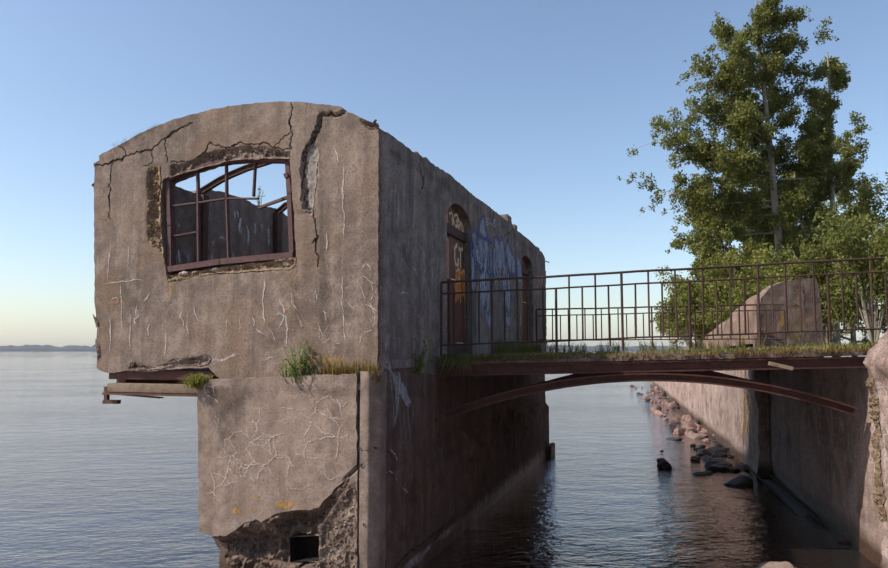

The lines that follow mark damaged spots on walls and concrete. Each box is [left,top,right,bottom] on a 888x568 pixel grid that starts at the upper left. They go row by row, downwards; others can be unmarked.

crack [104,106,345,264]
spalling [304,143,320,212]
crack [203,384,391,502]
spalling [212,476,358,568]